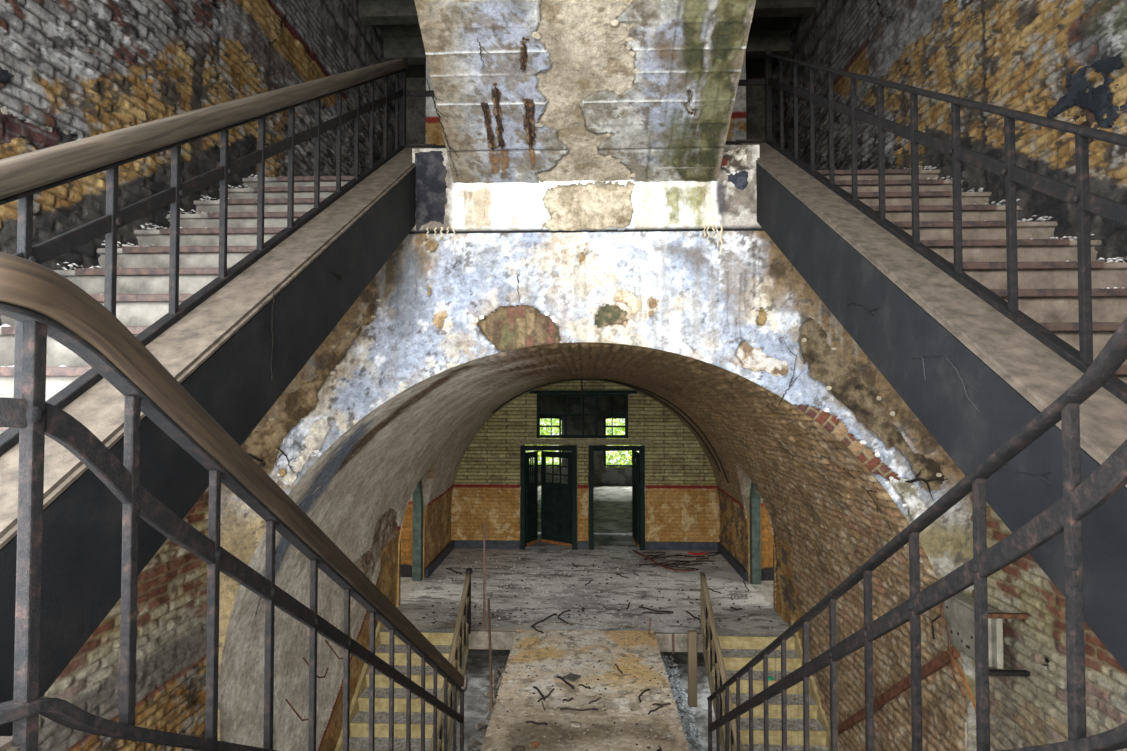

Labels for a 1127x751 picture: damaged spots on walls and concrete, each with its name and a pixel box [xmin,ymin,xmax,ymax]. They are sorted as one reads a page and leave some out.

rust [519,37,529,72]
spalling [0,106,78,150]
rust [481,83,509,173]
rust [522,98,536,169]
peeling [532,0,640,231]
leakage [655,183,749,323]
leakage [394,256,419,334]
flaking render [477,305,561,352]
flaking render [594,290,660,329]
crack [914,354,980,412]
flaking render [795,317,944,521]